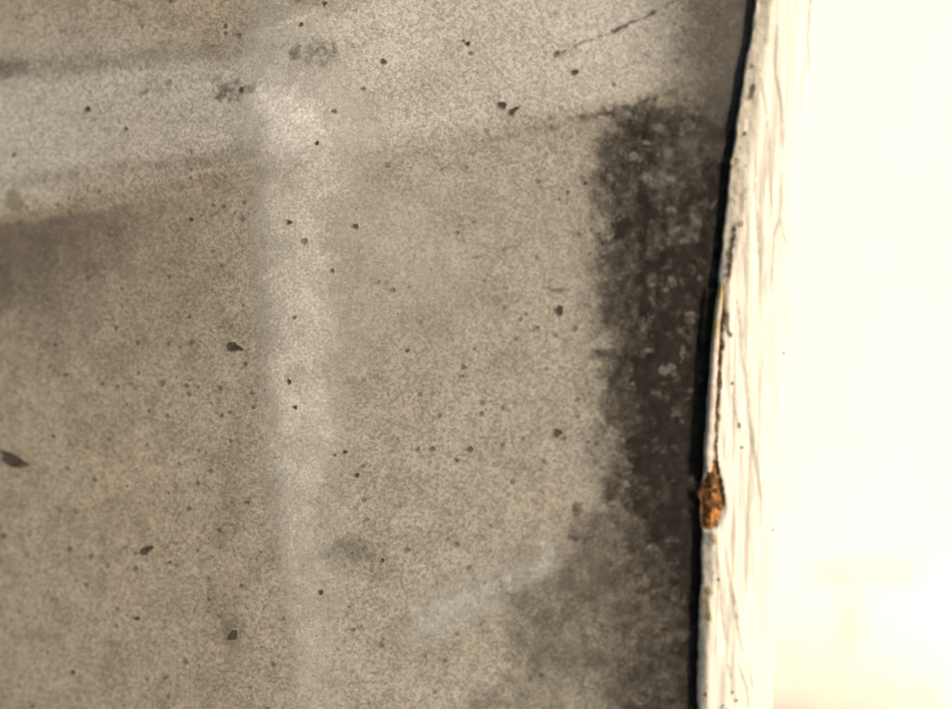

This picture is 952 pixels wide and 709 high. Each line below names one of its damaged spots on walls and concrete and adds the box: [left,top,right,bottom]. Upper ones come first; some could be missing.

water stain [556,0,755,709]
corrosion [698,227,736,530]